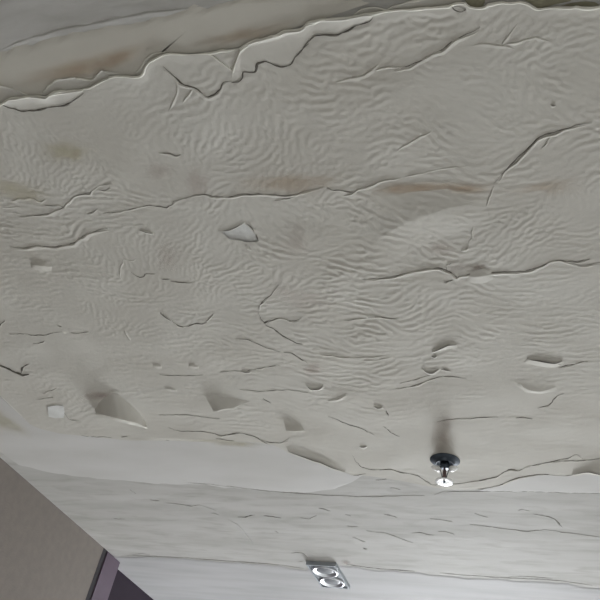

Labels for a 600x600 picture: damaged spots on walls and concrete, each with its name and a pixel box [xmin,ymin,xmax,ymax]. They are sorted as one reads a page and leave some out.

peeling [108,28,301,79]
peeling [232,18,335,83]
peeling [300,16,373,45]
peeling [337,2,464,20]
peeling [464,0,600,11]
peeling [2,90,83,112]
crack [486,123,590,207]
crack [1,165,469,251]
crack [364,264,470,284]
crack [490,259,600,276]
crack [221,286,396,373]
crack [352,455,600,497]